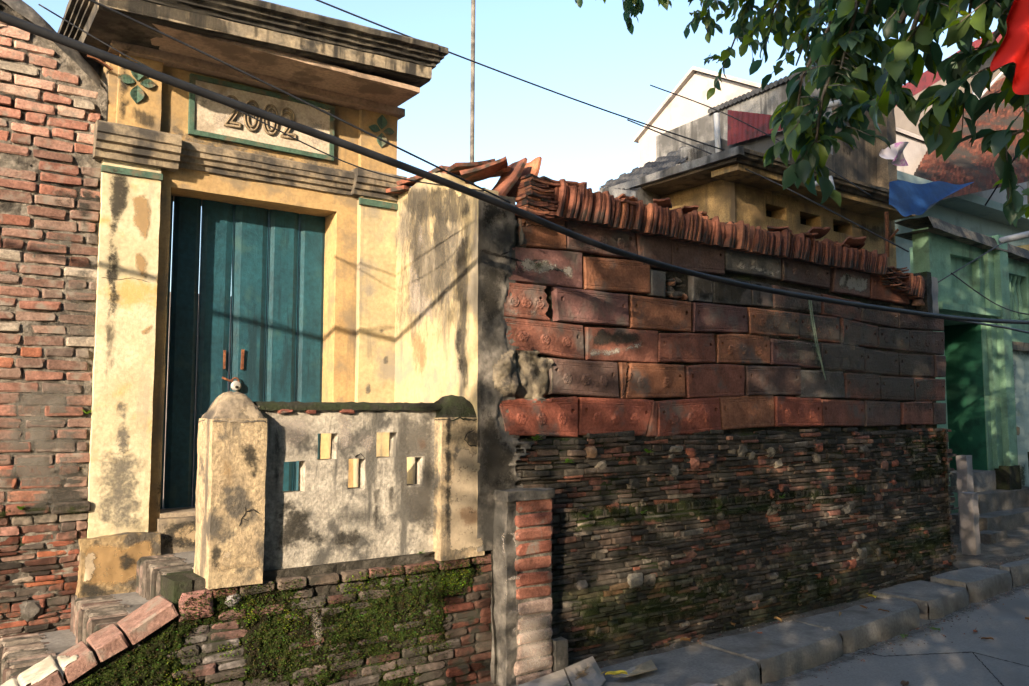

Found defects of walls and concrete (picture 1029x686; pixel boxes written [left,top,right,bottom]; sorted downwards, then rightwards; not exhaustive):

water stain [109,169,128,231]
peeling [134,196,150,237]
water stain [107,245,118,313]
peeling [135,254,146,277]
water stain [401,188,469,386]
water stain [241,446,258,477]
water stain [373,420,451,532]
water stain [279,503,320,549]
water stain [337,530,360,545]
flaking render [80,541,152,596]